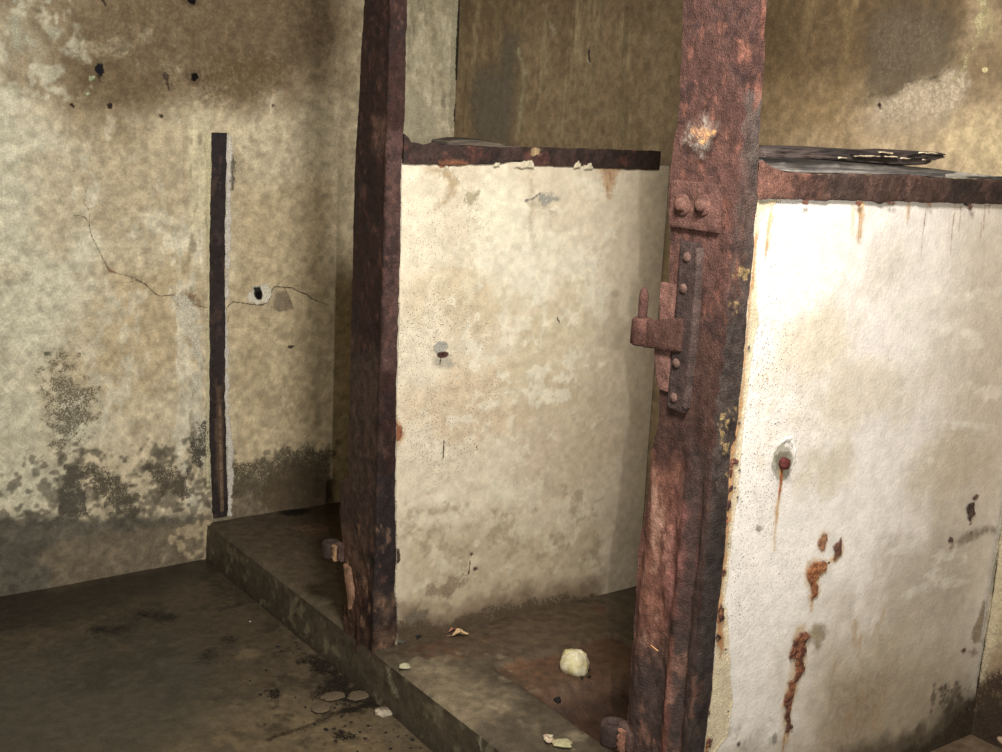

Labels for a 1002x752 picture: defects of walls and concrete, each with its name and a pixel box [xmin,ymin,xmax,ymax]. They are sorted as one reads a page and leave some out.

crack [77,215,199,306]
spalling [247,283,292,311]
crack [226,285,325,310]
damp [37,349,141,518]
damp [145,417,210,501]
damp [226,445,336,534]
damp [905,672,1002,752]